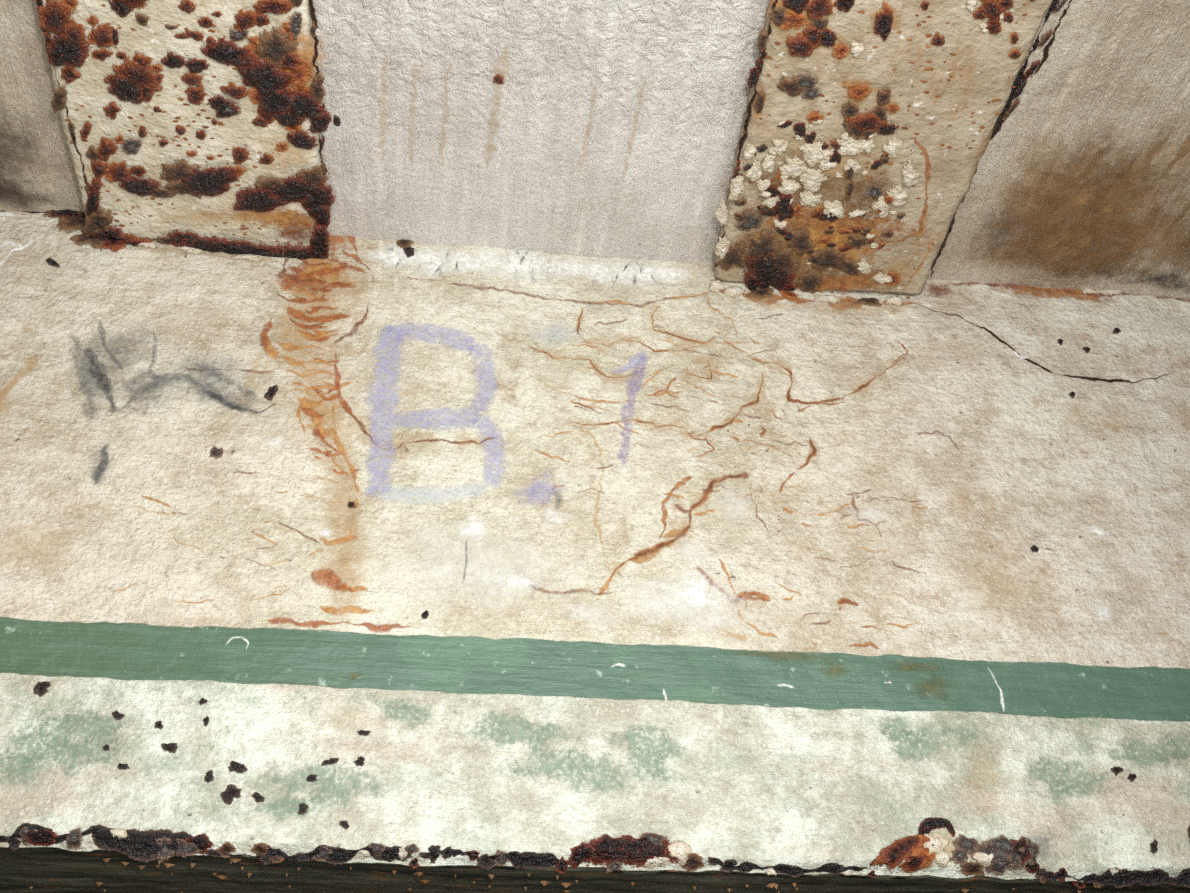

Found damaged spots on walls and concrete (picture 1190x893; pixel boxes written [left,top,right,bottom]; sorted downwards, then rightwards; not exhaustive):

rust [966,0,1034,59]
crack [990,0,1072,141]
rust [709,0,968,310]
damp [0,184,47,216]
damp [990,133,1190,274]
crack [396,0,927,595]
crack [850,137,1190,383]
damp [1138,275,1183,287]
crack [352,414,492,452]
rust [311,569,367,592]
rust [268,606,410,632]
crack [697,559,830,639]